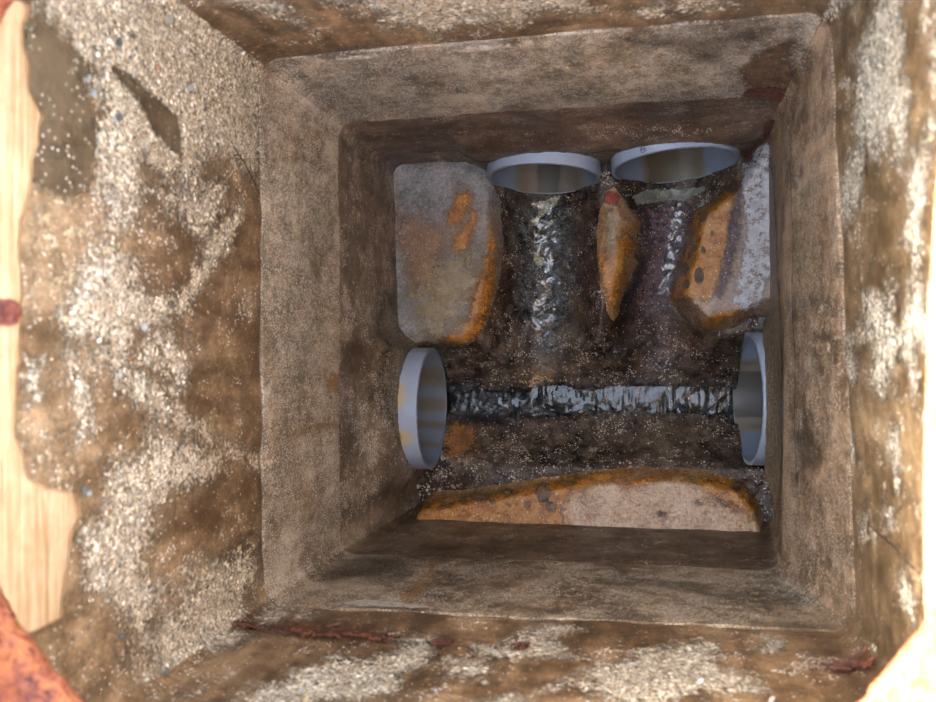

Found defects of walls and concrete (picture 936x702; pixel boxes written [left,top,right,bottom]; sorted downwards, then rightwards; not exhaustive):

water stain [112,65,182,161]
water stain [23,20,98,322]
rust [403,189,502,347]
water stain [483,202,610,354]
rust [597,224,638,315]
water stain [629,202,728,357]
rust [669,187,734,302]
rust [702,309,742,327]
water stain [446,371,737,426]
water stain [21,428,78,492]
rust [417,468,760,525]
rust [233,611,395,642]